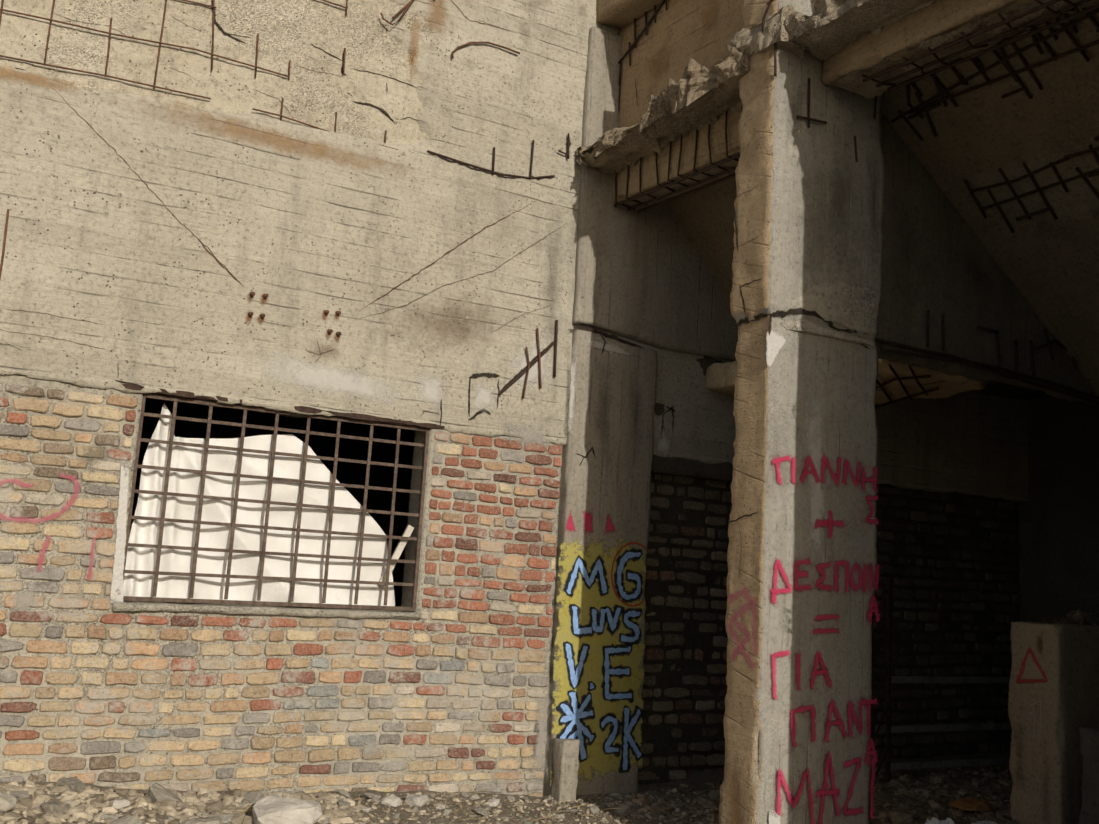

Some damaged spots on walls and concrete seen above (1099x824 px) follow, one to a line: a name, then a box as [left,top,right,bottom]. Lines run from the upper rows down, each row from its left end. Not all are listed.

corrosion [0,68,66,85]
spalling [618,0,668,85]
spalling [831,0,1099,141]
crack [52,88,245,288]
spalling [613,110,740,213]
crack [358,206,568,320]
crack [729,184,873,349]
peeling [767,808,781,824]